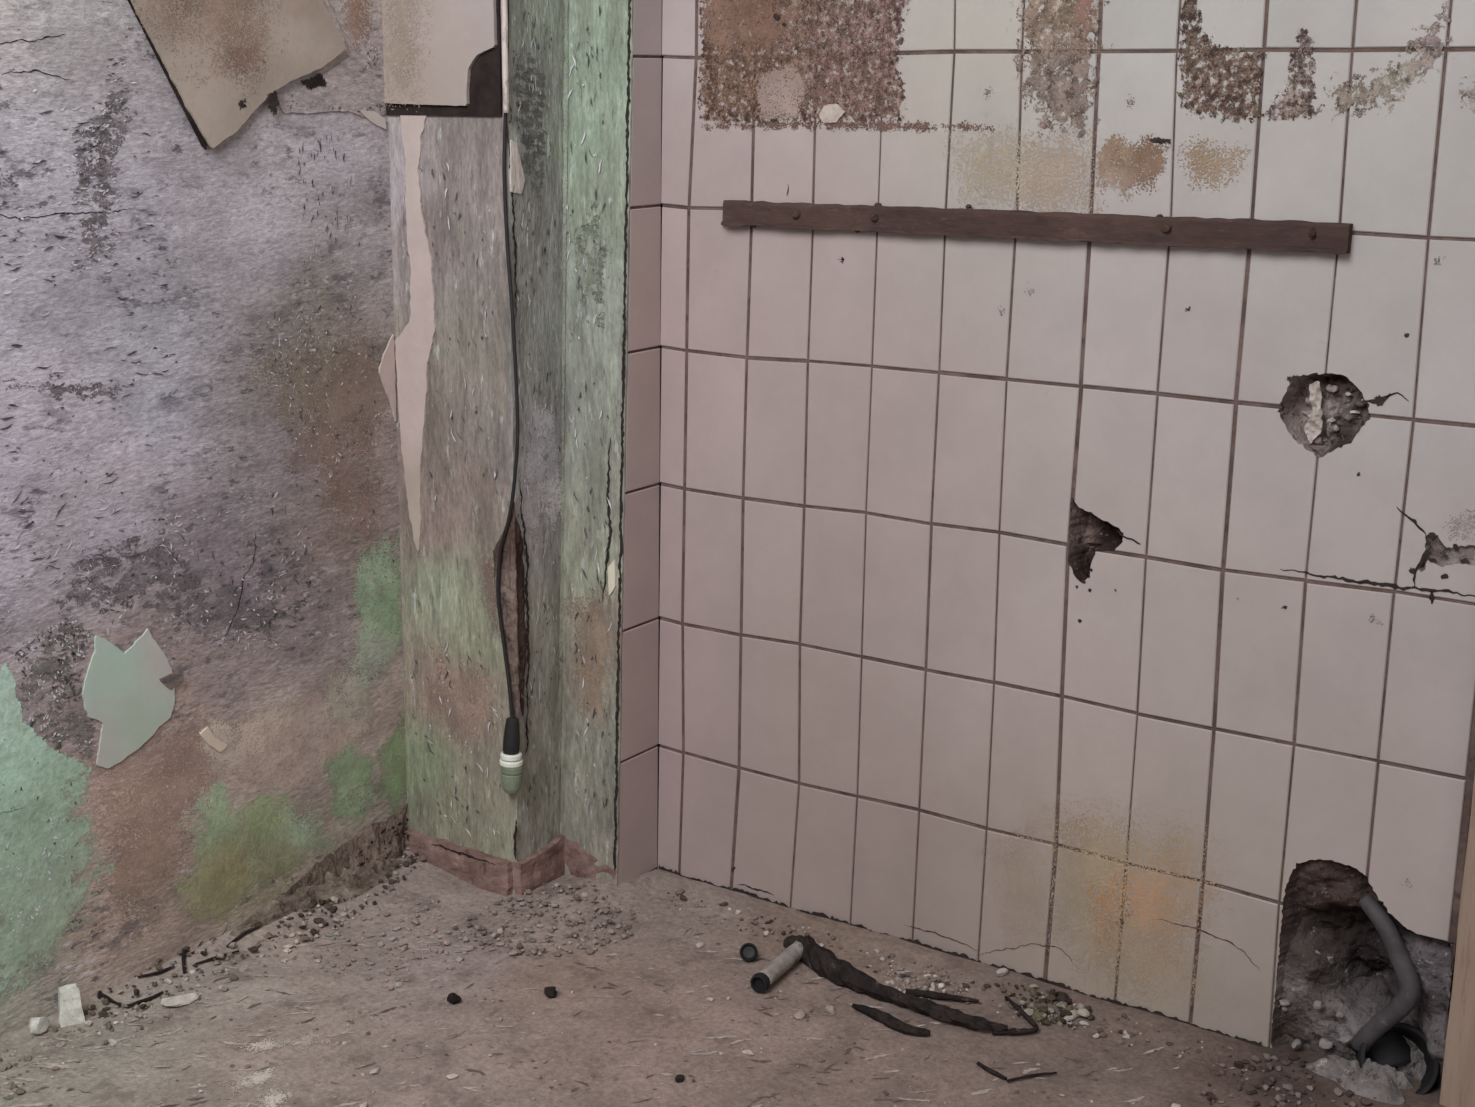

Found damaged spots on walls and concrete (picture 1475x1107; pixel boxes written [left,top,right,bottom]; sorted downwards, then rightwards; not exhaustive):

spalling [1278,373,1409,457]
spalling [1068,498,1140,592]
crack [1280,569,1475,604]
spalling [1397,507,1475,588]
peeling [0,530,301,1002]
crack [523,717,531,754]
spalling [1271,859,1453,1088]